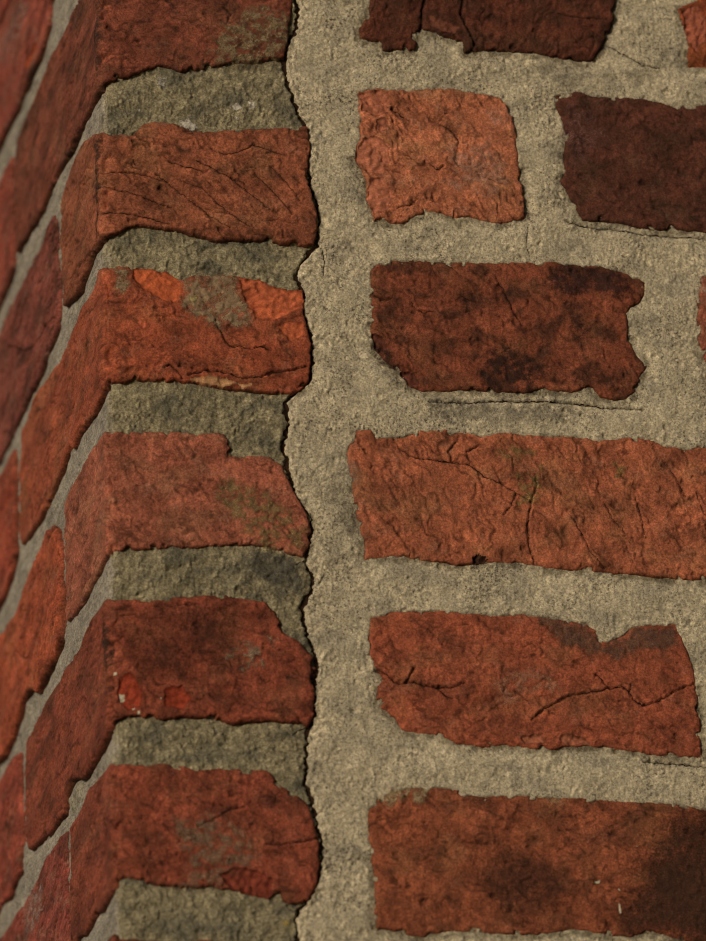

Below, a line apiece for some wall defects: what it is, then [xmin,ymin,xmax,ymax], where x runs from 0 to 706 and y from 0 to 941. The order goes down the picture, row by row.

crack [282,0,306,126]
crack [430,401,639,410]
crack [97,145,325,941]
crack [379,670,459,699]
crack [532,674,692,719]